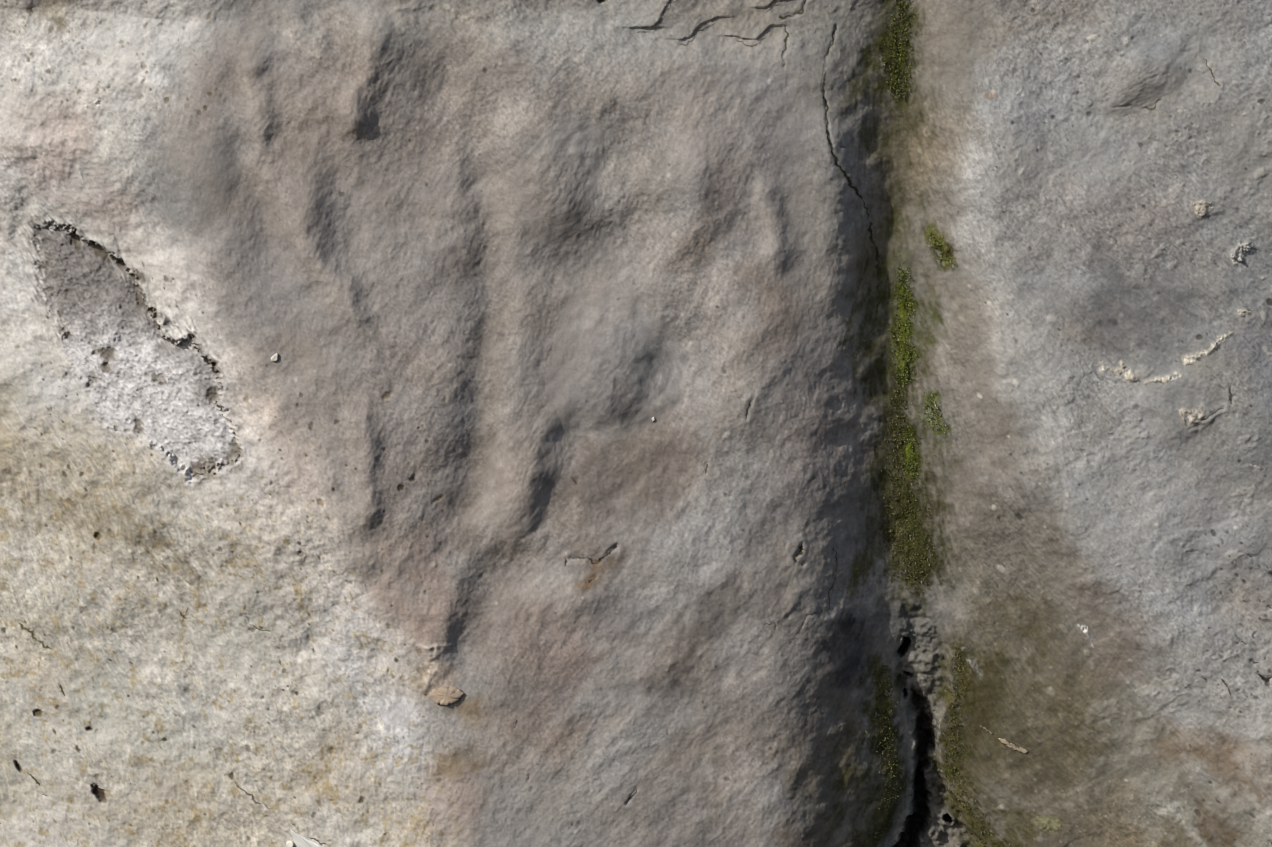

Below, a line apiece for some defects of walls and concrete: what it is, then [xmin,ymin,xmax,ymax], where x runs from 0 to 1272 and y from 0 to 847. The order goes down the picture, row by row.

crack [779,0,806,67]
crack [822,28,882,357]
spalling [34,223,243,480]
crack [893,637,953,847]